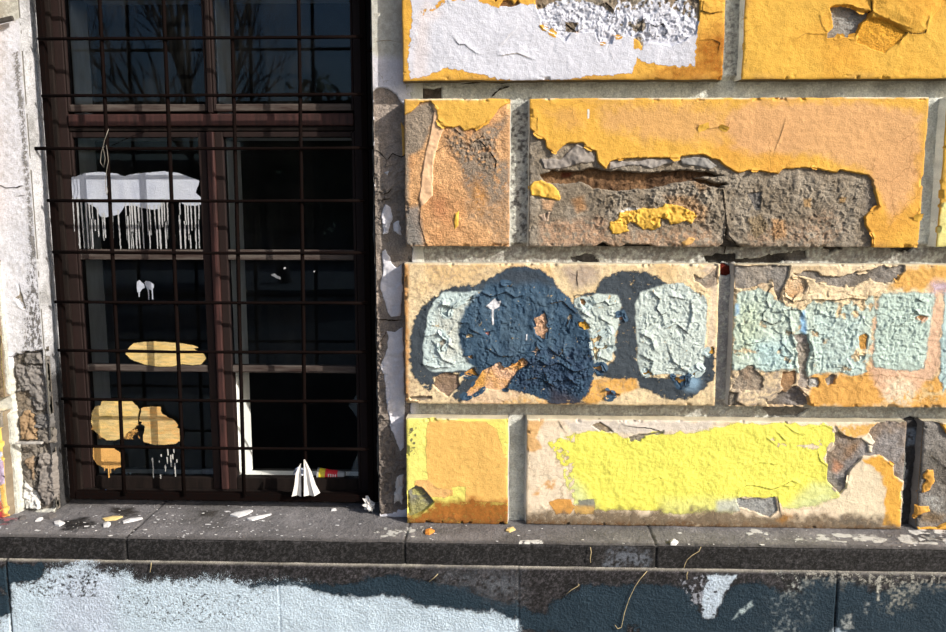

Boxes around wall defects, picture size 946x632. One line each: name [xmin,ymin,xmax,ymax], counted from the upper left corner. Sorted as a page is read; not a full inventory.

flaking render [535,0,703,46]
peeling [827,3,906,53]
peeling [698,122,730,132]
flaking render [528,129,904,303]
peeling [373,88,629,516]
flaking render [728,334,835,416]
peeling [851,334,868,362]
flaking render [0,336,65,527]
flaking render [826,416,946,528]